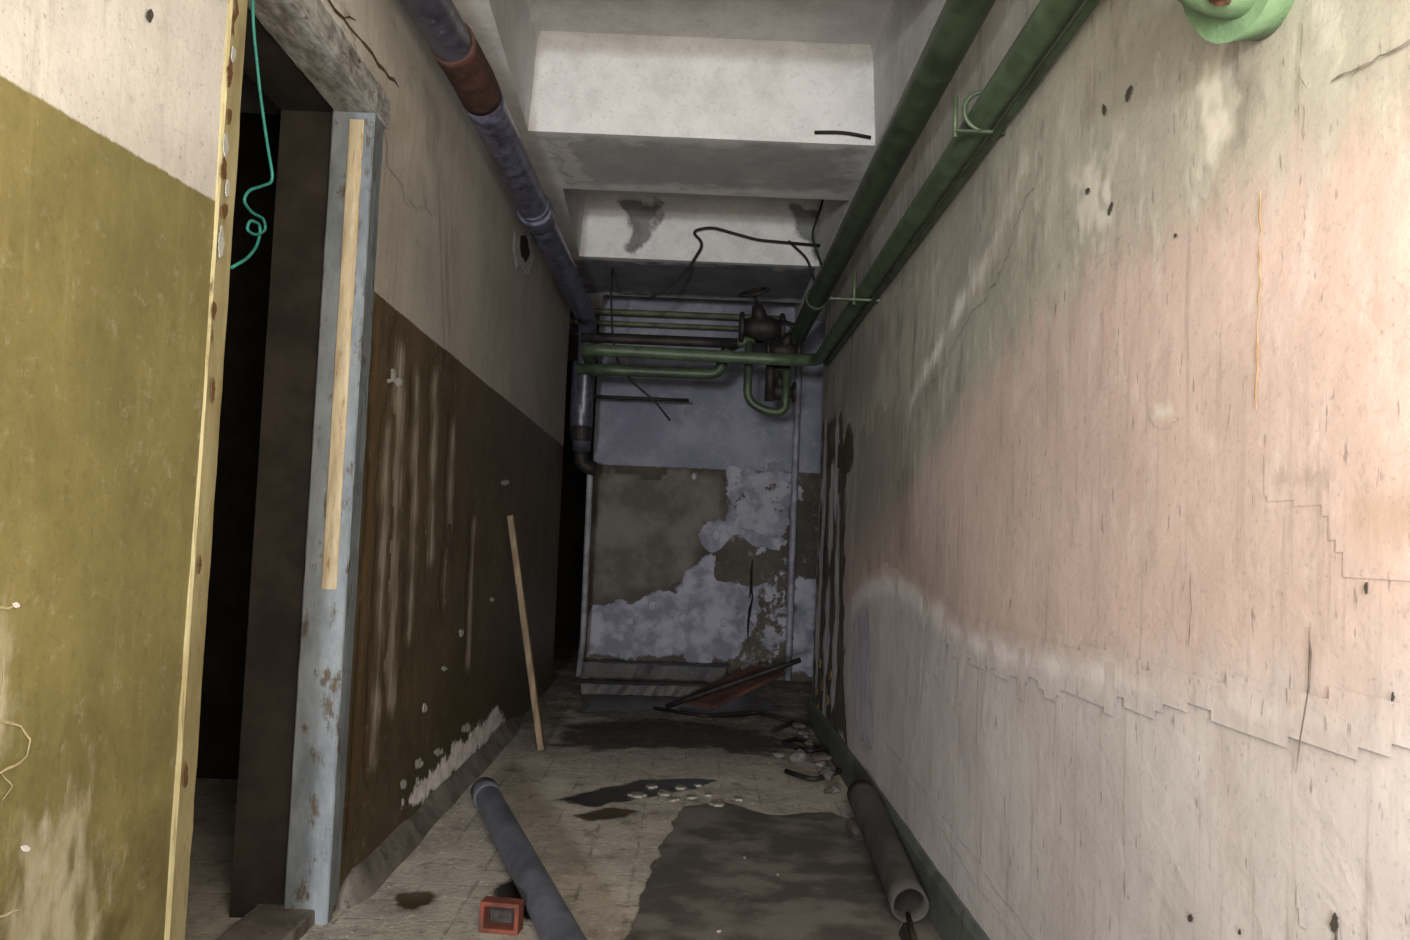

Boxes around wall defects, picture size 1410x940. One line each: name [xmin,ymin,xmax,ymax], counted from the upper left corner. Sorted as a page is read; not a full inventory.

corrosion [430,23,502,116]
crack [1298,19,1410,122]
water stain [363,167,479,788]
peeling [586,408,854,745]